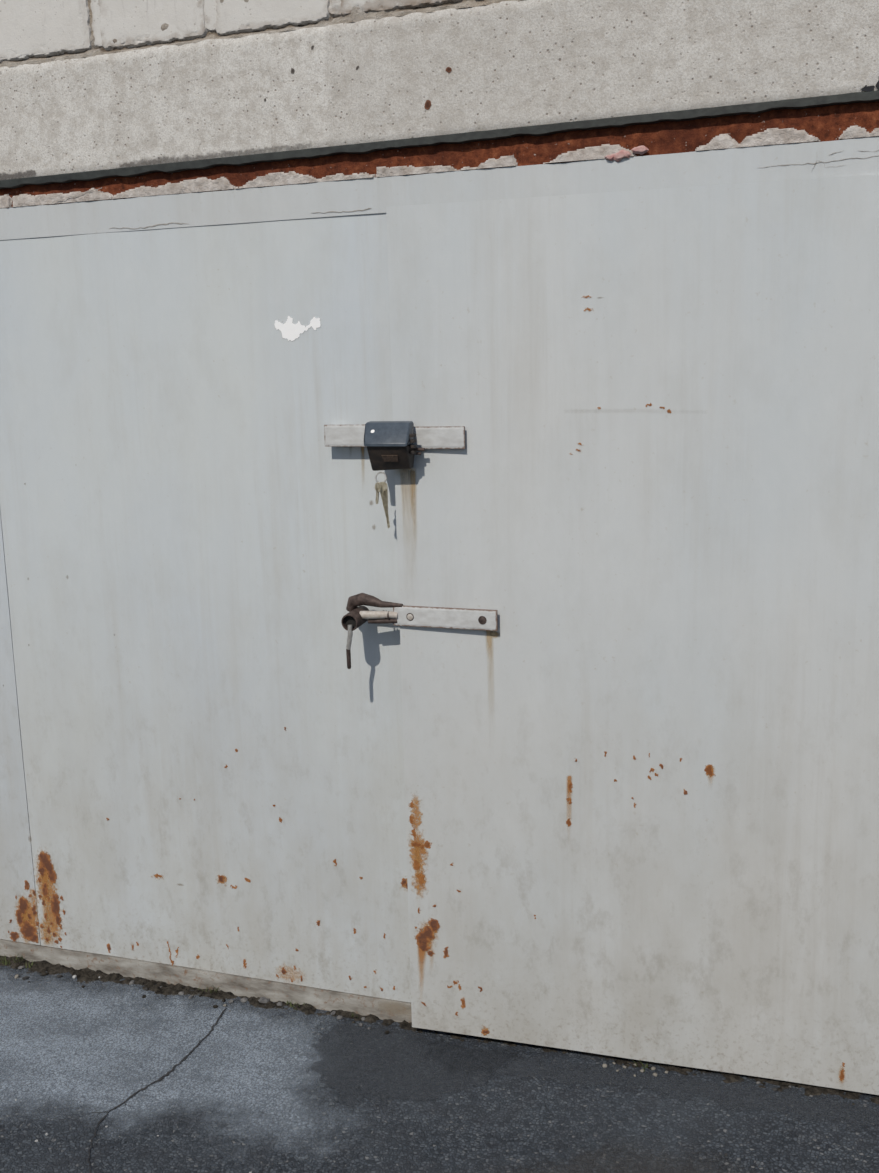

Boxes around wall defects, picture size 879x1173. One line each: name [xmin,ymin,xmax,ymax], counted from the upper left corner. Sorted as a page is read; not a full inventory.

rust [401,799,432,894]
rust [8,851,66,948]
rust [415,905,449,969]
crack [87,1008,226,1173]